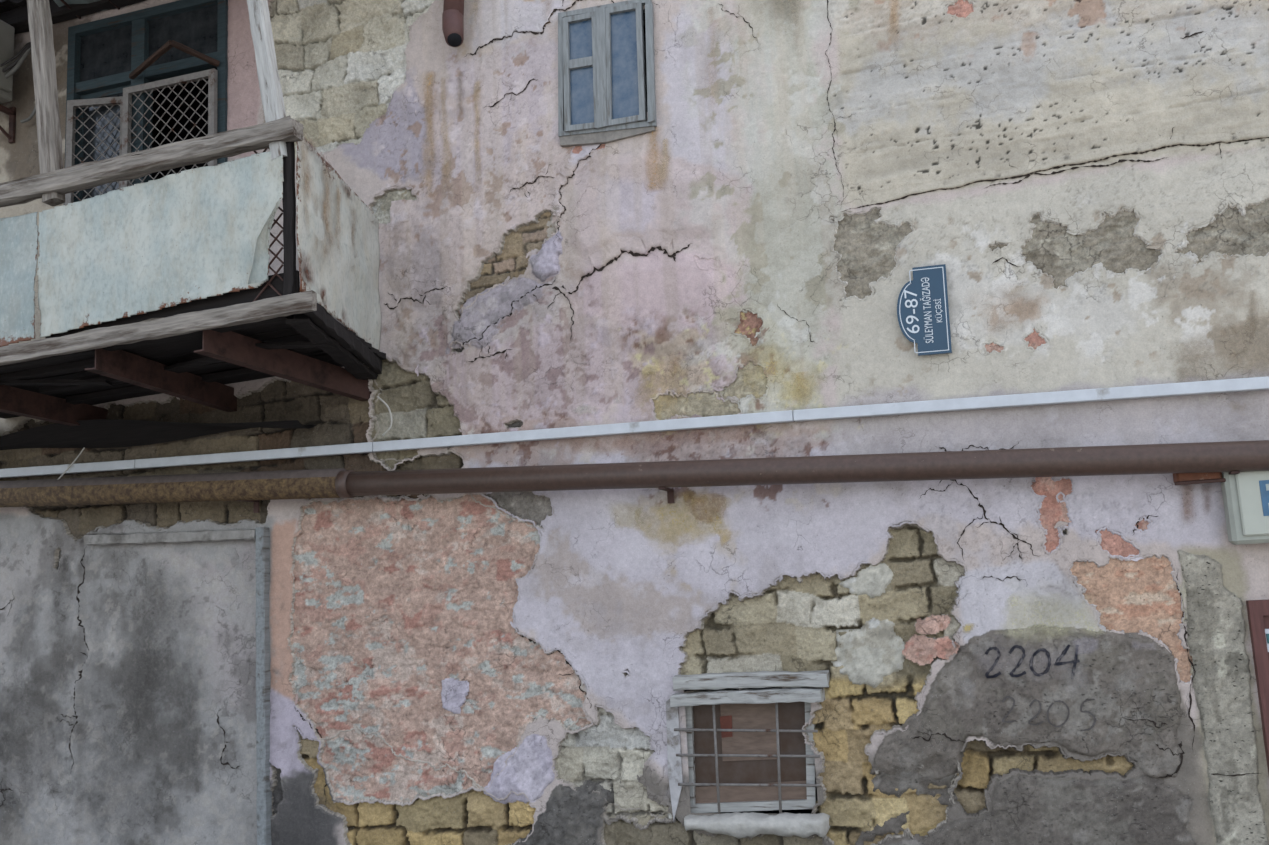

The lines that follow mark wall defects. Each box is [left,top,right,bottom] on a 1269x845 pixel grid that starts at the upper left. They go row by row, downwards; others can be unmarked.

flaking render [268,0,436,160]
crack [485,75,537,107]
crack [466,0,614,56]
crack [825,0,1269,212]
flaking render [453,208,561,320]
crack [506,144,601,239]
crack [454,231,693,362]
flaking render [986,196,1269,291]
flaking render [0,358,466,481]
crack [919,443,1041,587]
peeling [1068,515,1193,686]
peeling [286,491,1138,845]